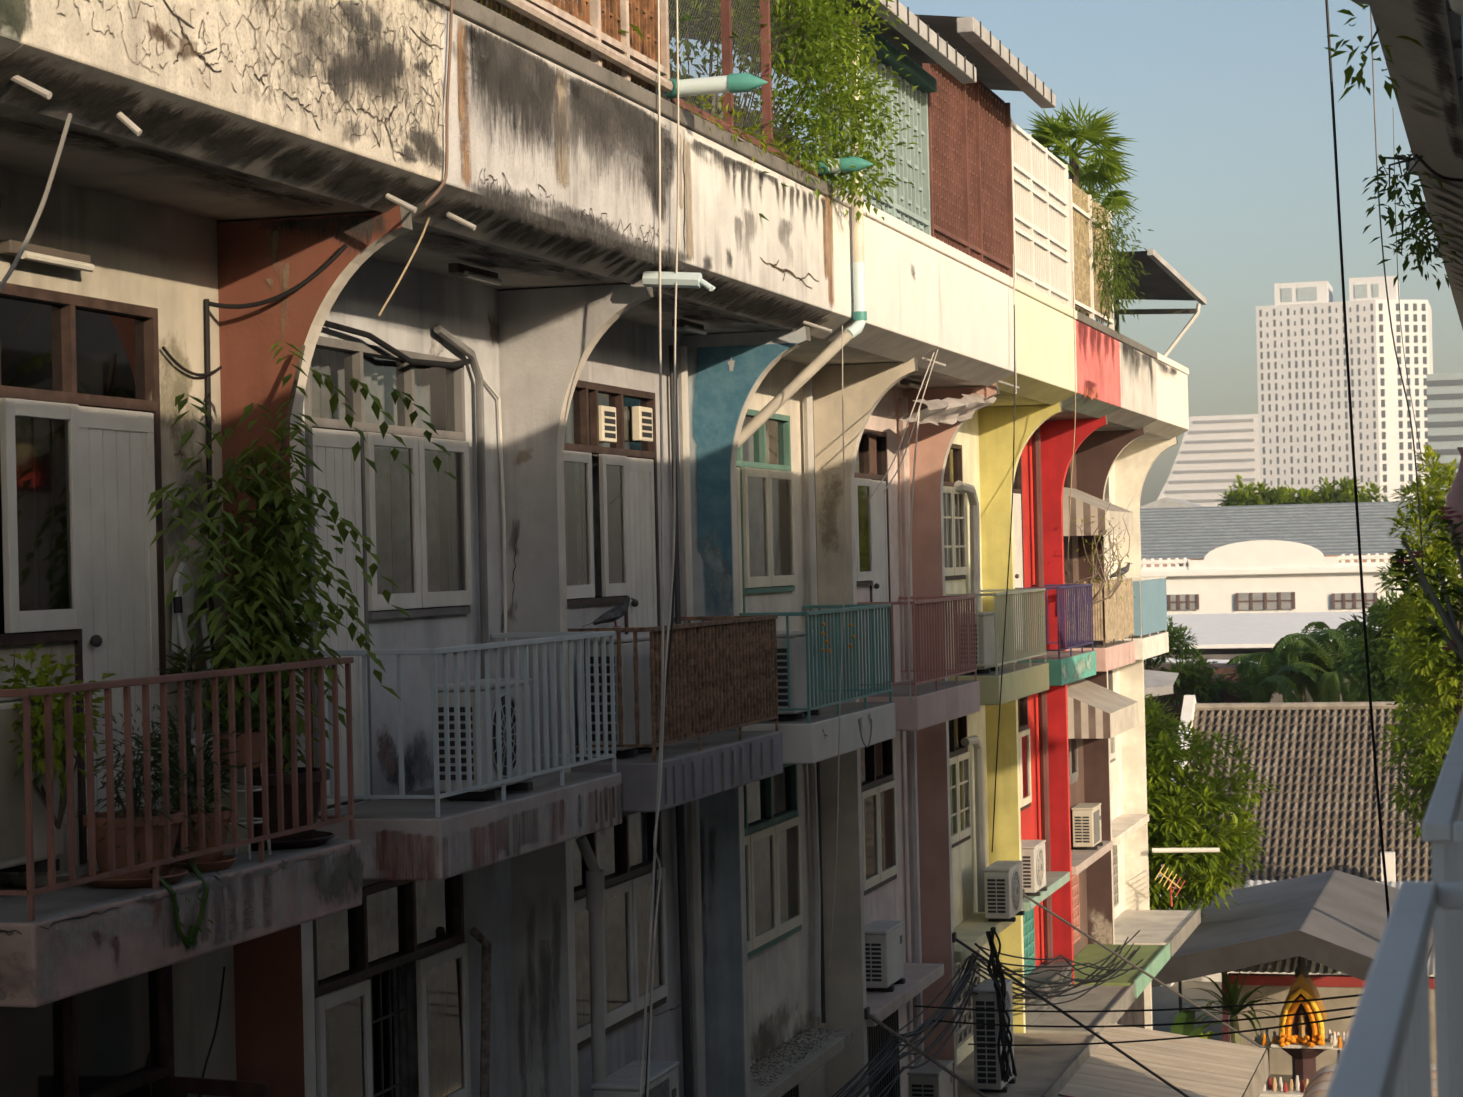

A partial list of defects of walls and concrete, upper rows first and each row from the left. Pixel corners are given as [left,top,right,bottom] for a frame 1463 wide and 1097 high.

crack [56,0,446,167]
damp [0,0,827,329]
crack [760,257,819,288]
crack [0,884,208,936]